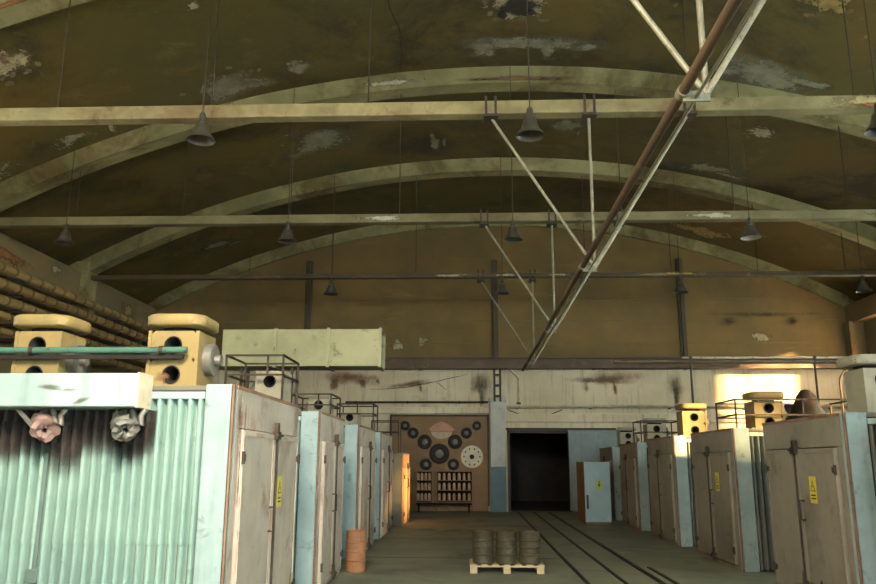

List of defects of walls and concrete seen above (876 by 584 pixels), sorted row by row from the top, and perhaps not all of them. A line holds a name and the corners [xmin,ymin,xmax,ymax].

spalling [482,0,549,22]
peeling [797,0,864,21]
spalling [0,50,41,86]